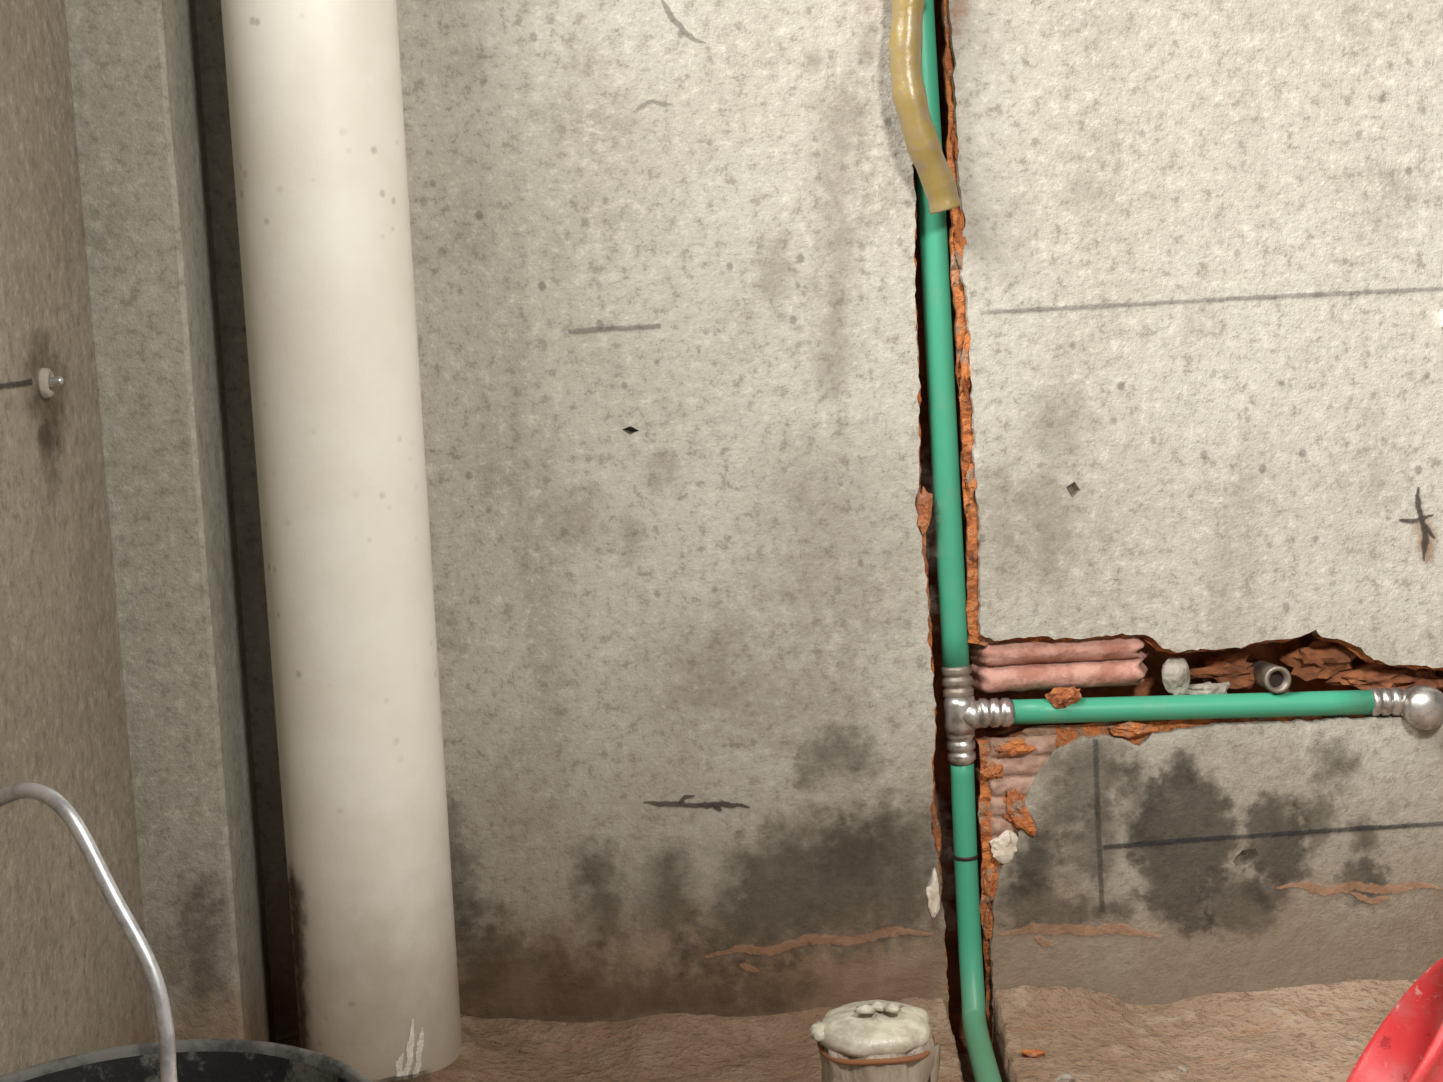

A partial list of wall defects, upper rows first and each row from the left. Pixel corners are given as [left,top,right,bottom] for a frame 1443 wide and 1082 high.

spalling [944,0,1443,671]
spalling [915,301,934,674]
spalling [930,708,943,903]
spalling [977,686,1393,1040]
damp [1131,768,1305,934]
crack [1276,881,1443,904]
damp [1346,859,1384,901]